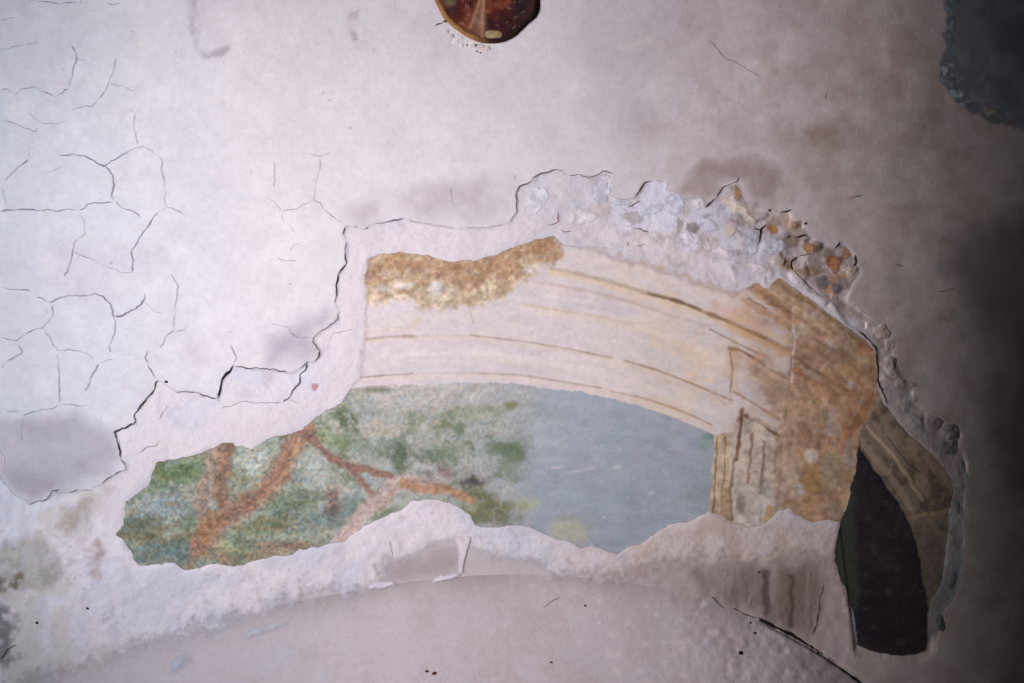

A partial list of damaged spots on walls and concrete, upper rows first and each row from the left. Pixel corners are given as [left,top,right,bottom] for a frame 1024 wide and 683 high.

flaking render [443,20,491,54]
crack [2,116,181,270]
crack [5,253,143,390]
crack [103,200,400,483]
flaking render [0,170,968,683]
crack [713,585,862,683]